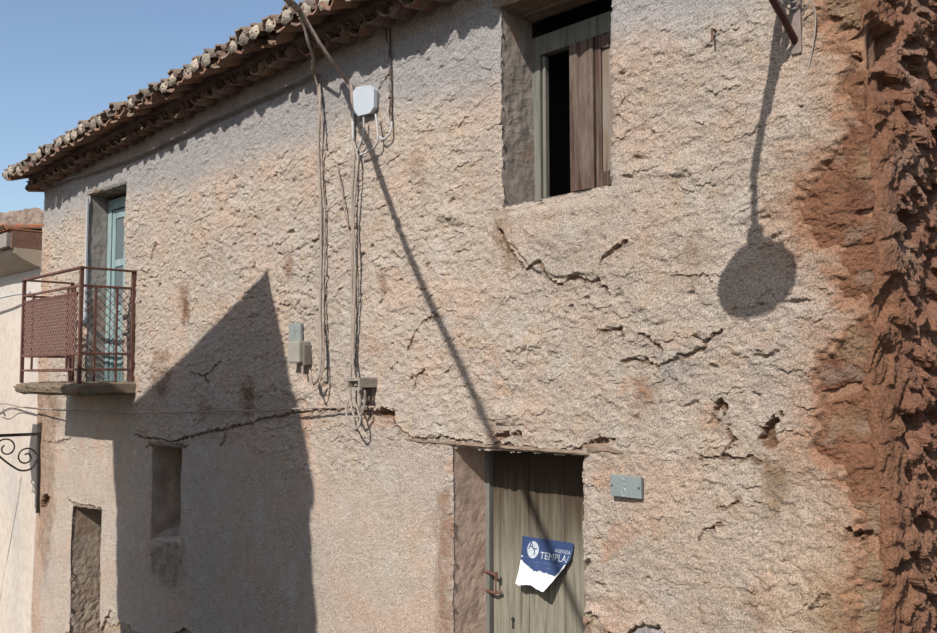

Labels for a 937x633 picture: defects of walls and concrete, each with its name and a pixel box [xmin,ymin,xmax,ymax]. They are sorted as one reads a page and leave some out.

crack [500,229,628,294]
flaking render [800,0,880,537]
crack [597,327,723,369]
crack [134,409,344,448]
crack [699,424,763,463]
hole [765,420,780,448]
flaking render [855,546,884,633]
flaking render [103,611,136,633]
flaking render [583,613,612,633]
flaking render [632,624,665,633]